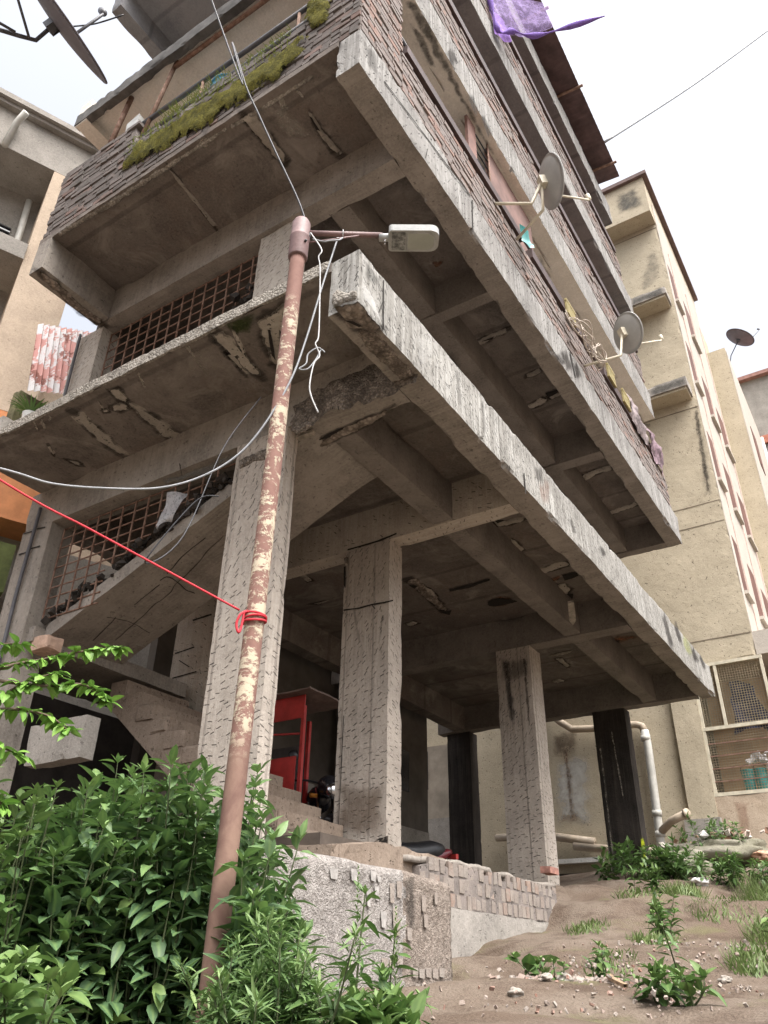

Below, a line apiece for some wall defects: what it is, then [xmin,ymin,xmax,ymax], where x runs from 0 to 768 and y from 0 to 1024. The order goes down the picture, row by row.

water stain [409,2,491,136]
peeling [209,302,285,382]
spalling [335,301,415,379]
peeling [69,386,180,456]
spalling [296,405,394,447]
crack [107,535,224,640]
crack [172,647,196,679]
water stain [503,663,514,718]